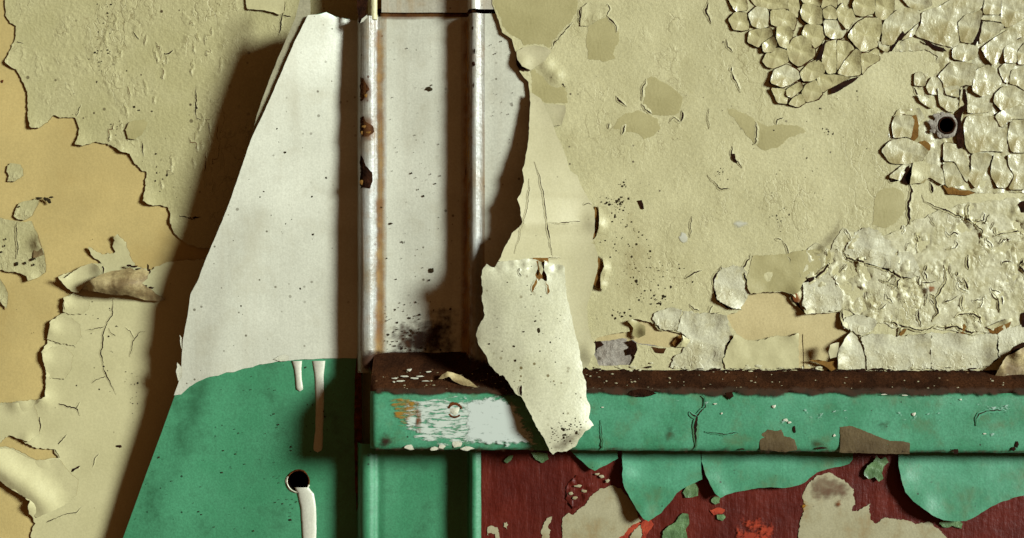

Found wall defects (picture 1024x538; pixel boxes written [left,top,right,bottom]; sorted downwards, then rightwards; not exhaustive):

crack [38,266,145,472]
peeling [0,0,369,538]
peeling [363,373,372,444]
rust [364,31,384,352]
peeling [476,0,1024,538]
crack [775,147,1024,368]